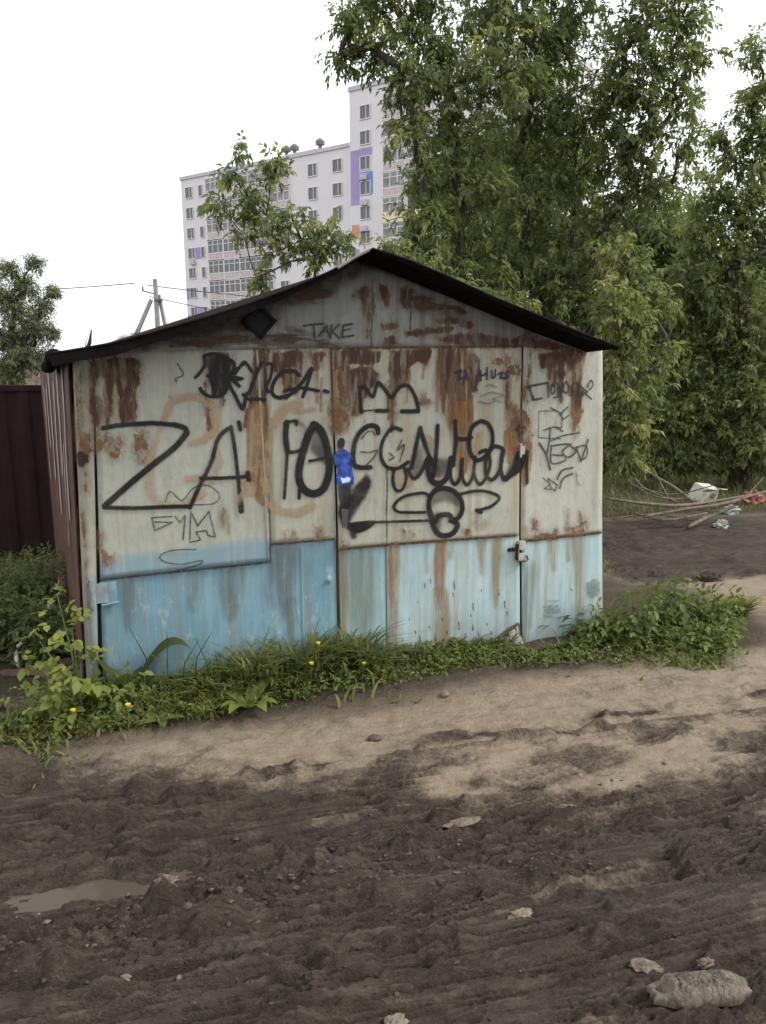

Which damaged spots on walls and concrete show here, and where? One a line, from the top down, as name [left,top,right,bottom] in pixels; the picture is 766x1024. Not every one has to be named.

rust [75,356,149,465]
rust [168,284,586,505]
rust [272,512,601,651]